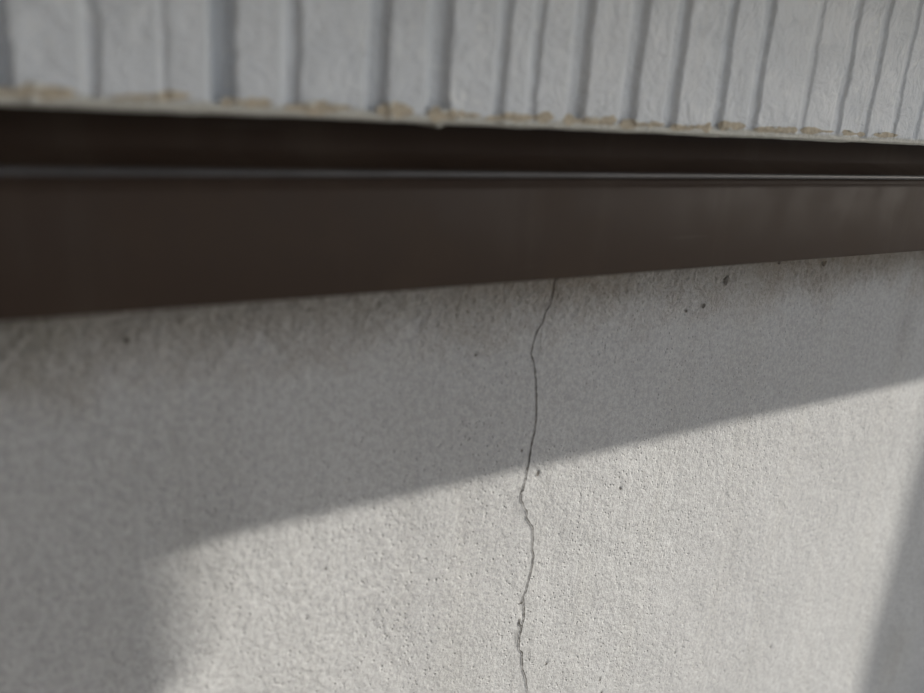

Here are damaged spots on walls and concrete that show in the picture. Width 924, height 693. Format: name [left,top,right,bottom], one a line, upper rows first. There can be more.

crack [516,279,556,690]